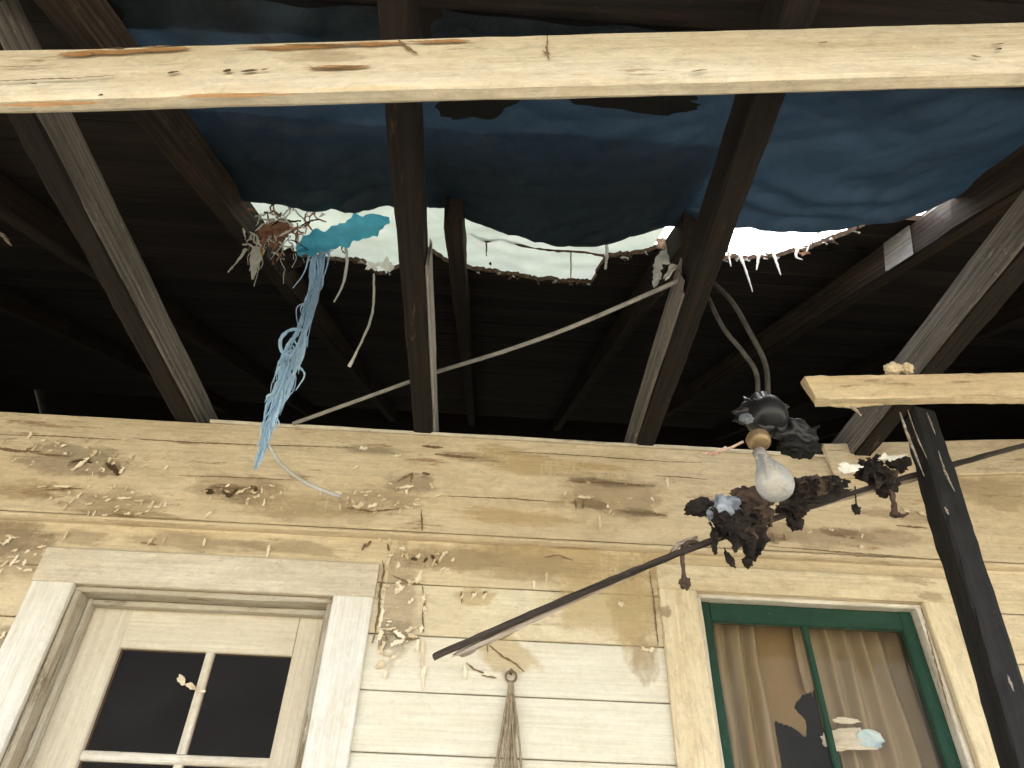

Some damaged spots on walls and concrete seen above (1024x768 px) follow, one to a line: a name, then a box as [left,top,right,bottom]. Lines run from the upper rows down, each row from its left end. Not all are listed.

peeling [10,432,179,518]
peeling [203,484,282,518]
peeling [335,472,440,531]
peeling [0,534,47,573]
peeling [361,538,455,679]